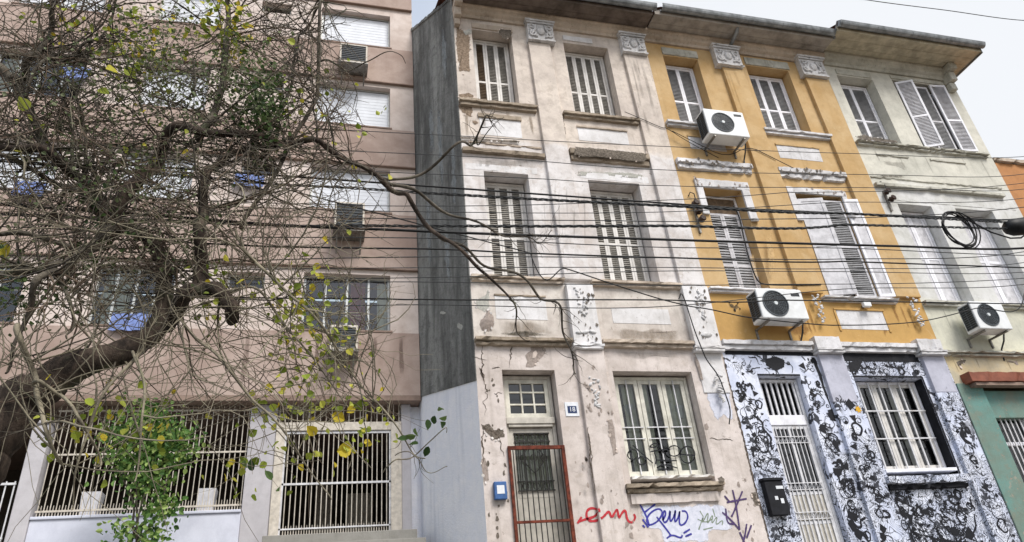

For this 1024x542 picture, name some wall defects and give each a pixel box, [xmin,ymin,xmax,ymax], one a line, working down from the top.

peeling [454,28,472,75]
flaking render [570,145,648,179]
flaking render [525,347,546,367]
crack [475,346,512,465]
flaking render [480,424,505,484]